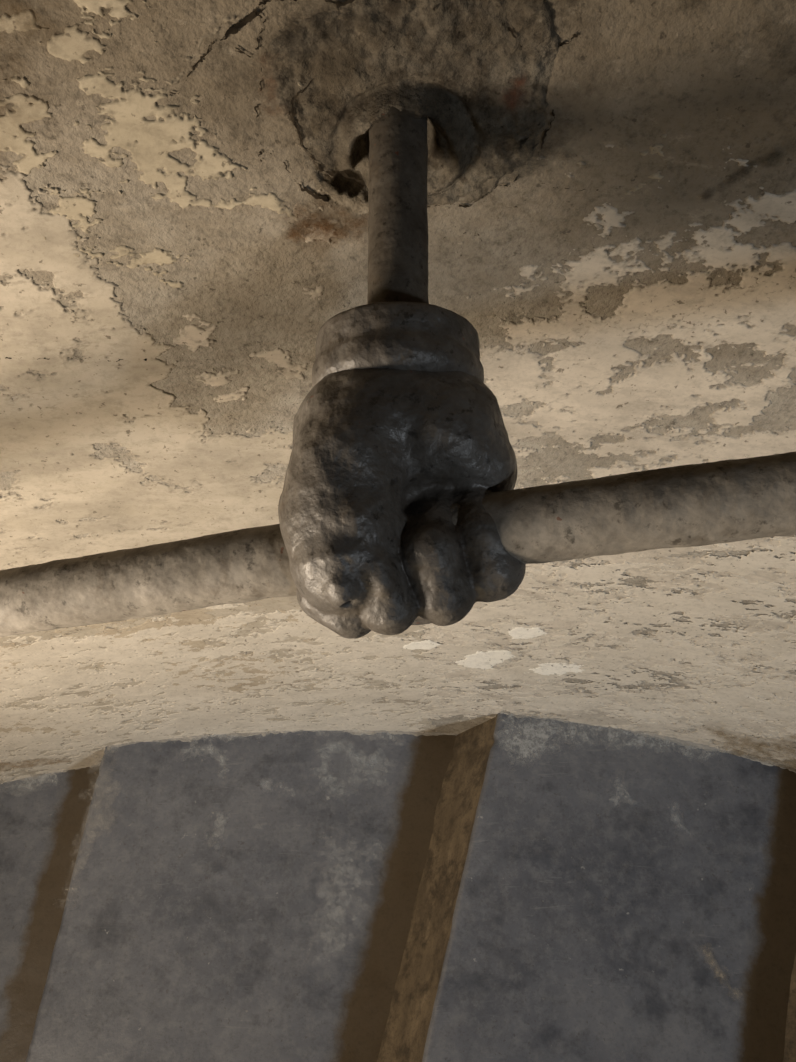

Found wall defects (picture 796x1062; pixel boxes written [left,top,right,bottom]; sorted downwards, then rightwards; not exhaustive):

peeling [0,0,339,245]
crack [154,0,365,204]
crack [427,109,618,241]
peeling [0,74,308,570]
peeling [480,171,796,489]